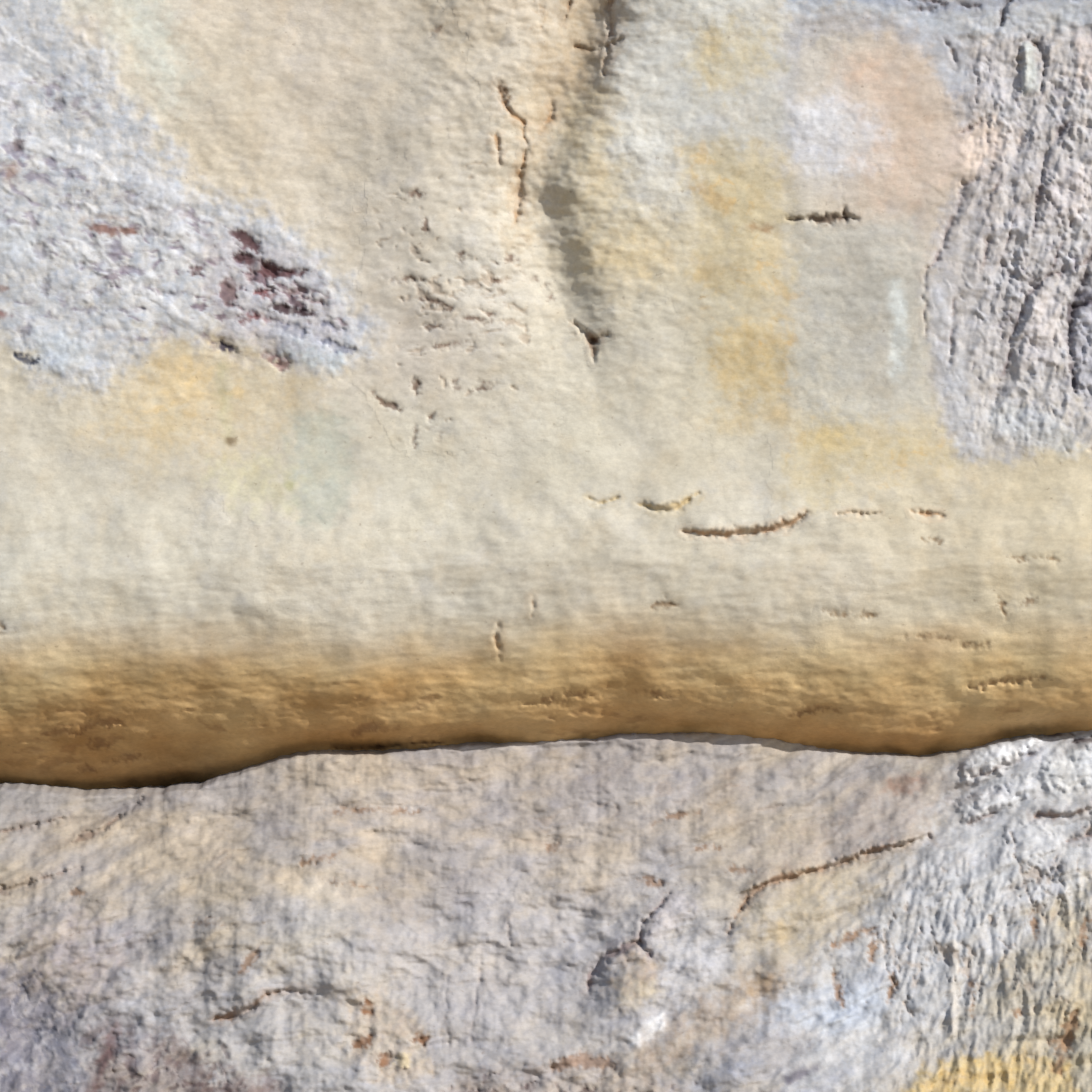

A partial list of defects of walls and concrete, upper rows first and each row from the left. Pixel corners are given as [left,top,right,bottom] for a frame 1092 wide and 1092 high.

crack [483,75,562,229]
peeling [773,0,1092,481]
crack [582,485,950,546]
crack [721,730,1092,942]